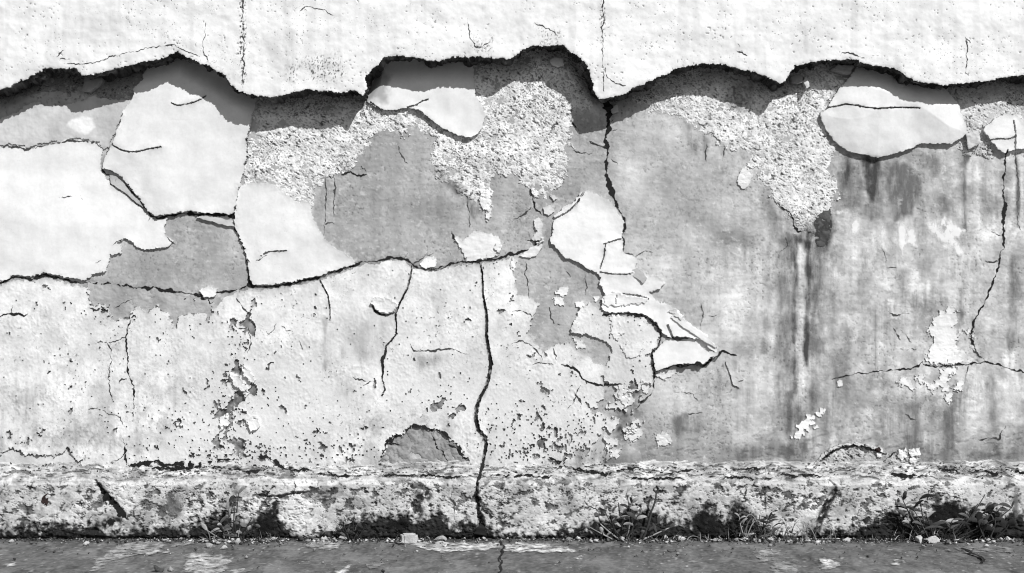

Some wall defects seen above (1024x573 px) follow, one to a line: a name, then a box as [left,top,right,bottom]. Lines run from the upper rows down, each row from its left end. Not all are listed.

crack [572,0,651,256]
flaking render [629,62,854,247]
flaking render [945,80,1024,159]
peeling [0,48,744,407]
leakage [794,220,832,303]
leakage [851,219,860,235]
leakage [864,156,967,256]
crack [0,137,1024,537]
leakage [779,313,817,372]
peeling [896,306,976,404]
leakage [773,445,808,463]
flaking render [812,441,921,467]